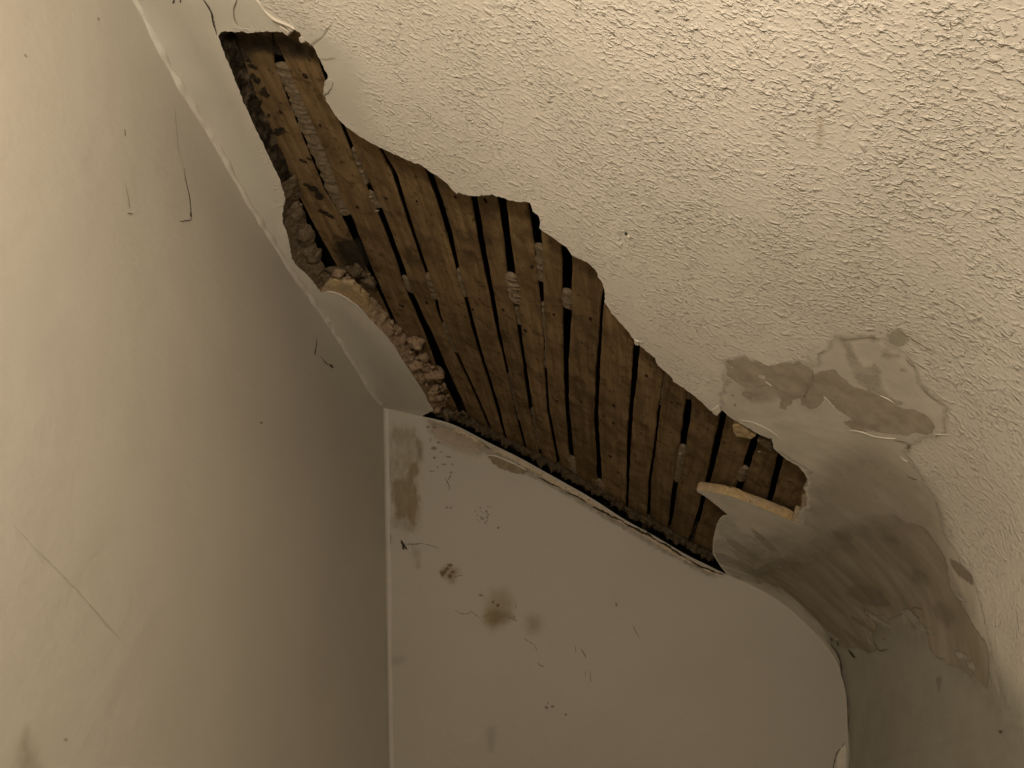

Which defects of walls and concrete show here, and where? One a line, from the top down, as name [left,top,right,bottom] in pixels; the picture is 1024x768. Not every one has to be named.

flaking render [218,0,1024,768]
damp [714,468,988,687]